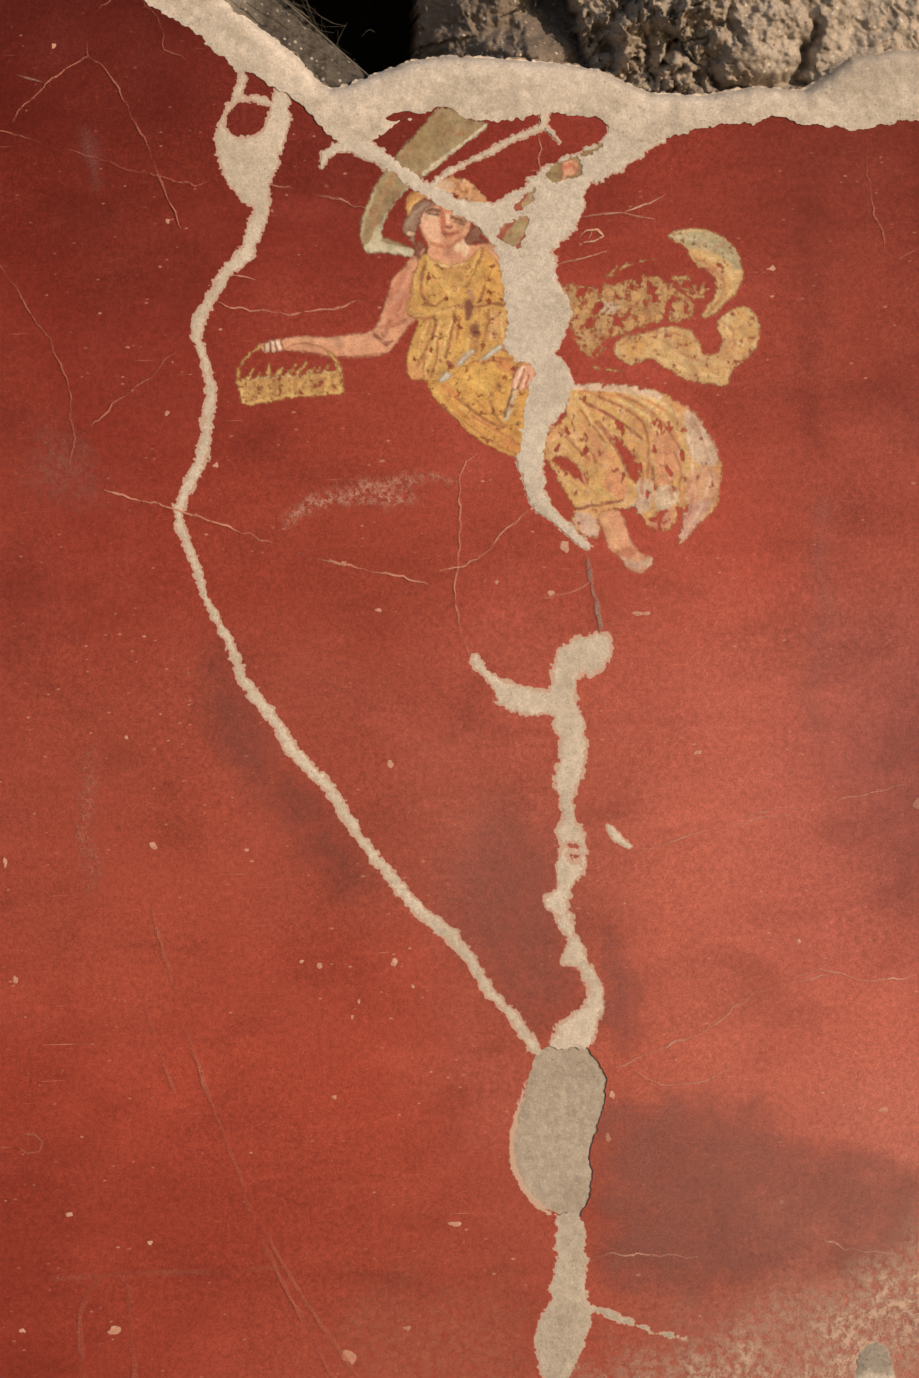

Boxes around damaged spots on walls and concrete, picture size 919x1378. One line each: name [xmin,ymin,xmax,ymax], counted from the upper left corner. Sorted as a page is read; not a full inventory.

crack [0,53,146,139]
spalling [276,0,919,95]
flaking render [320,127,665,553]
crack [54,70,610,1055]
flaking render [607,825,631,848]
efflorescence [668,1251,919,1378]